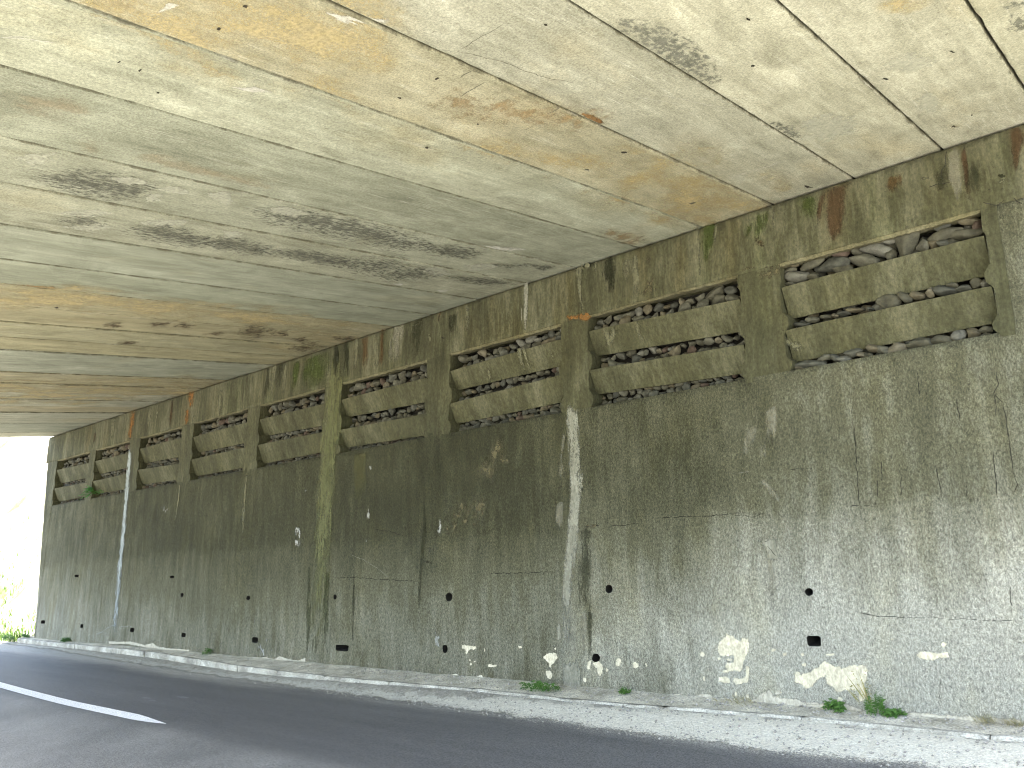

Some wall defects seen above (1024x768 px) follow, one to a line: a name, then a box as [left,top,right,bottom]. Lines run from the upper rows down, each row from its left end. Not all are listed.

rust [961,149,969,190]
rust [1009,127,1023,168]
rust [817,186,846,240]
leakage [124,209,555,332]
crack [851,399,902,507]
crack [993,372,1018,498]
leakage [108,450,189,652]
leakage [557,407,592,645]
crack [863,587,1023,622]
flaking render [543,647,558,679]
flaking render [718,633,749,698]
flaking render [794,653,869,702]